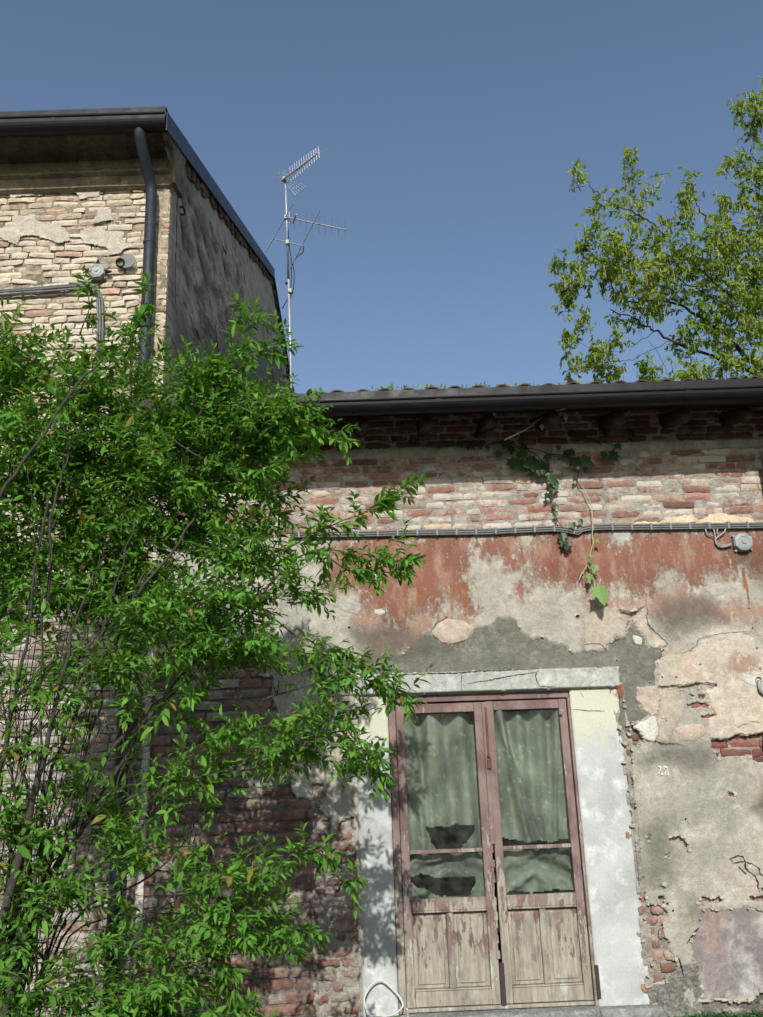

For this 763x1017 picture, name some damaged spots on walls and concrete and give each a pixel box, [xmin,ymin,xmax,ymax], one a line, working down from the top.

flaking render [322,512,763,1017]
flaking render [290,773,355,820]
crack [730,855,763,893]